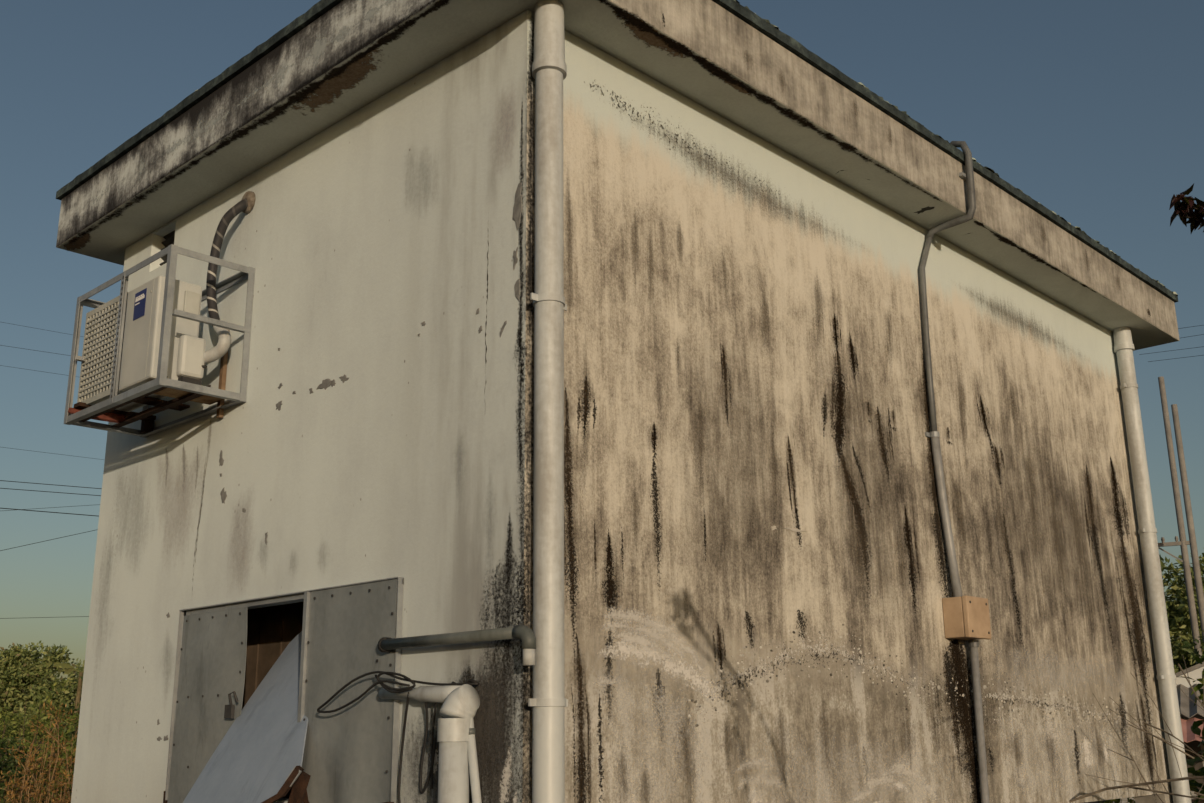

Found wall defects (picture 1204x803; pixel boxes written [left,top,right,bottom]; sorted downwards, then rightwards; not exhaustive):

leakage [63,0,449,251]
leakage [598,0,942,202]
peeling [276,374,349,411]
leakage [460,19,535,803]
leakage [720,344,732,420]
leakage [564,370,935,803]
leakage [816,280,872,604]
leakage [920,354,953,598]
leakage [947,384,1004,486]
leakage [974,221,1107,299]
leakage [944,455,1159,803]
leakage [412,713,444,803]